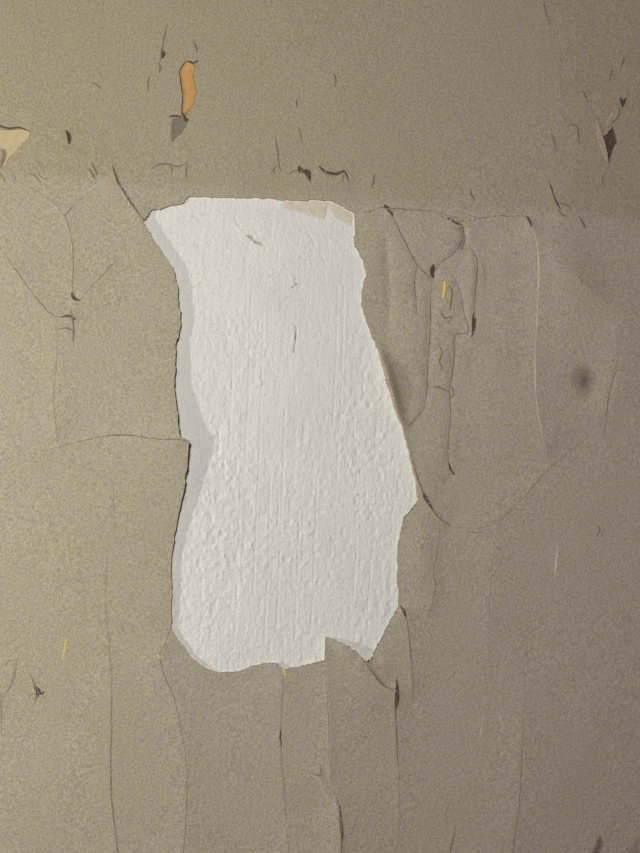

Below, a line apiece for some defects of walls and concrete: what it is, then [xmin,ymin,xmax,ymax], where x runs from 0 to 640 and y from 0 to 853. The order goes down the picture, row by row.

peeling [0,125,32,169]
peeling [172,61,196,142]
peeling [596,116,617,163]
peeling [51,164,468,853]
crack [0,657,44,732]
crack [105,482,118,851]
crack [159,631,188,853]
crack [279,671,290,853]
crack [313,639,343,845]
crack [370,543,439,809]